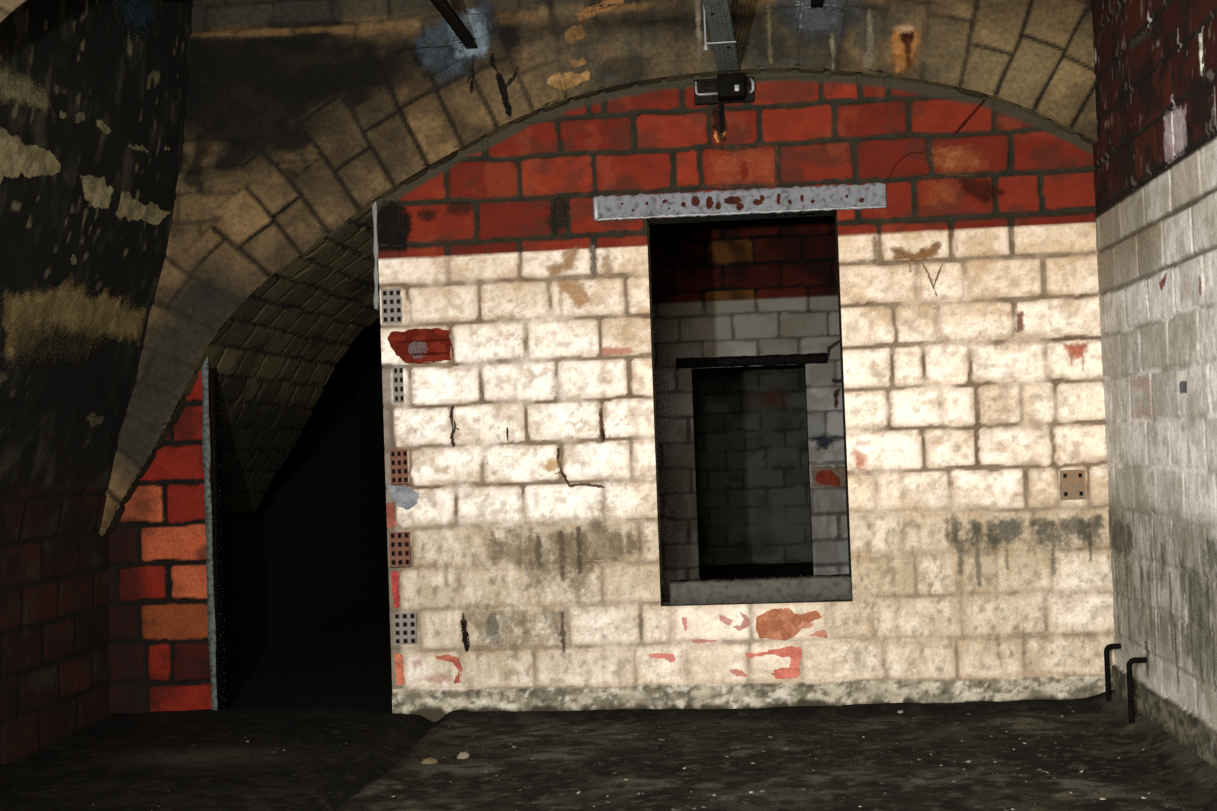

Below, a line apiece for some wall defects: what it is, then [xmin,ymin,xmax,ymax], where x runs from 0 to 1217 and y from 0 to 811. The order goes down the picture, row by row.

corrosion [890,25,919,72]
flaking render [387,328,453,364]
crack [555,448,605,488]
water stain [492,521,638,588]
water stain [946,511,1217,691]
peeling [682,617,717,644]
peeling [719,608,828,679]